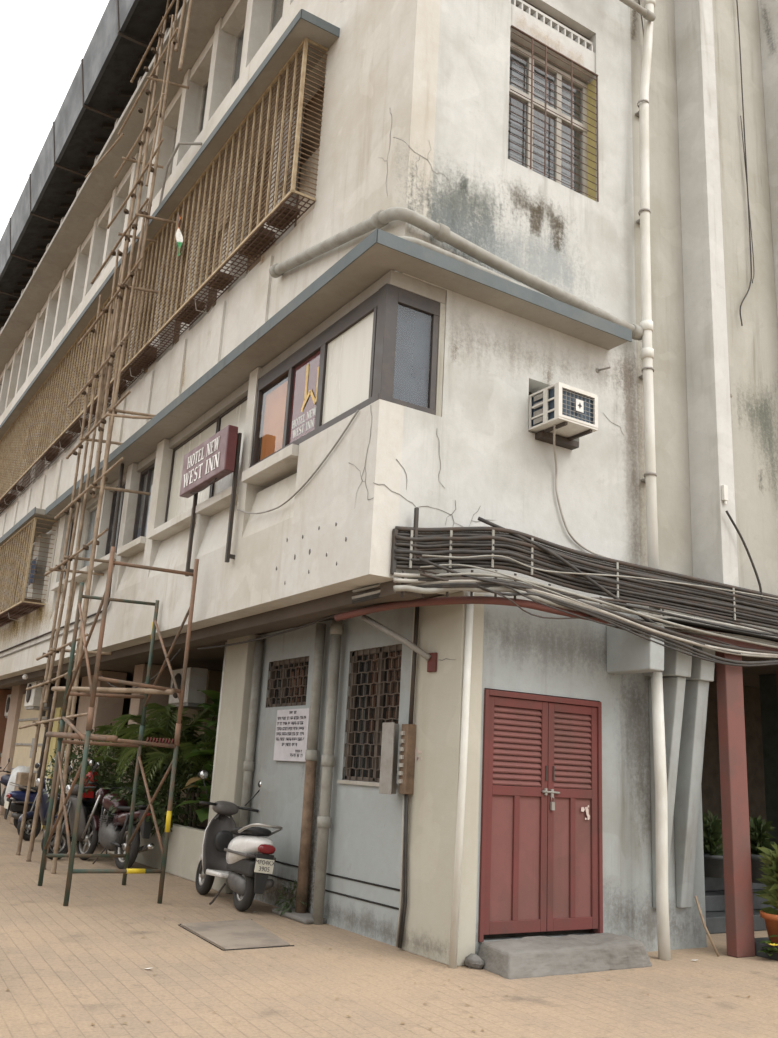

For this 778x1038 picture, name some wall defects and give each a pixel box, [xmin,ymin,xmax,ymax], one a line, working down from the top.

crack [383,113,451,196]
water stain [427,180,489,247]
water stain [514,192,563,249]
crack [349,405,487,527]